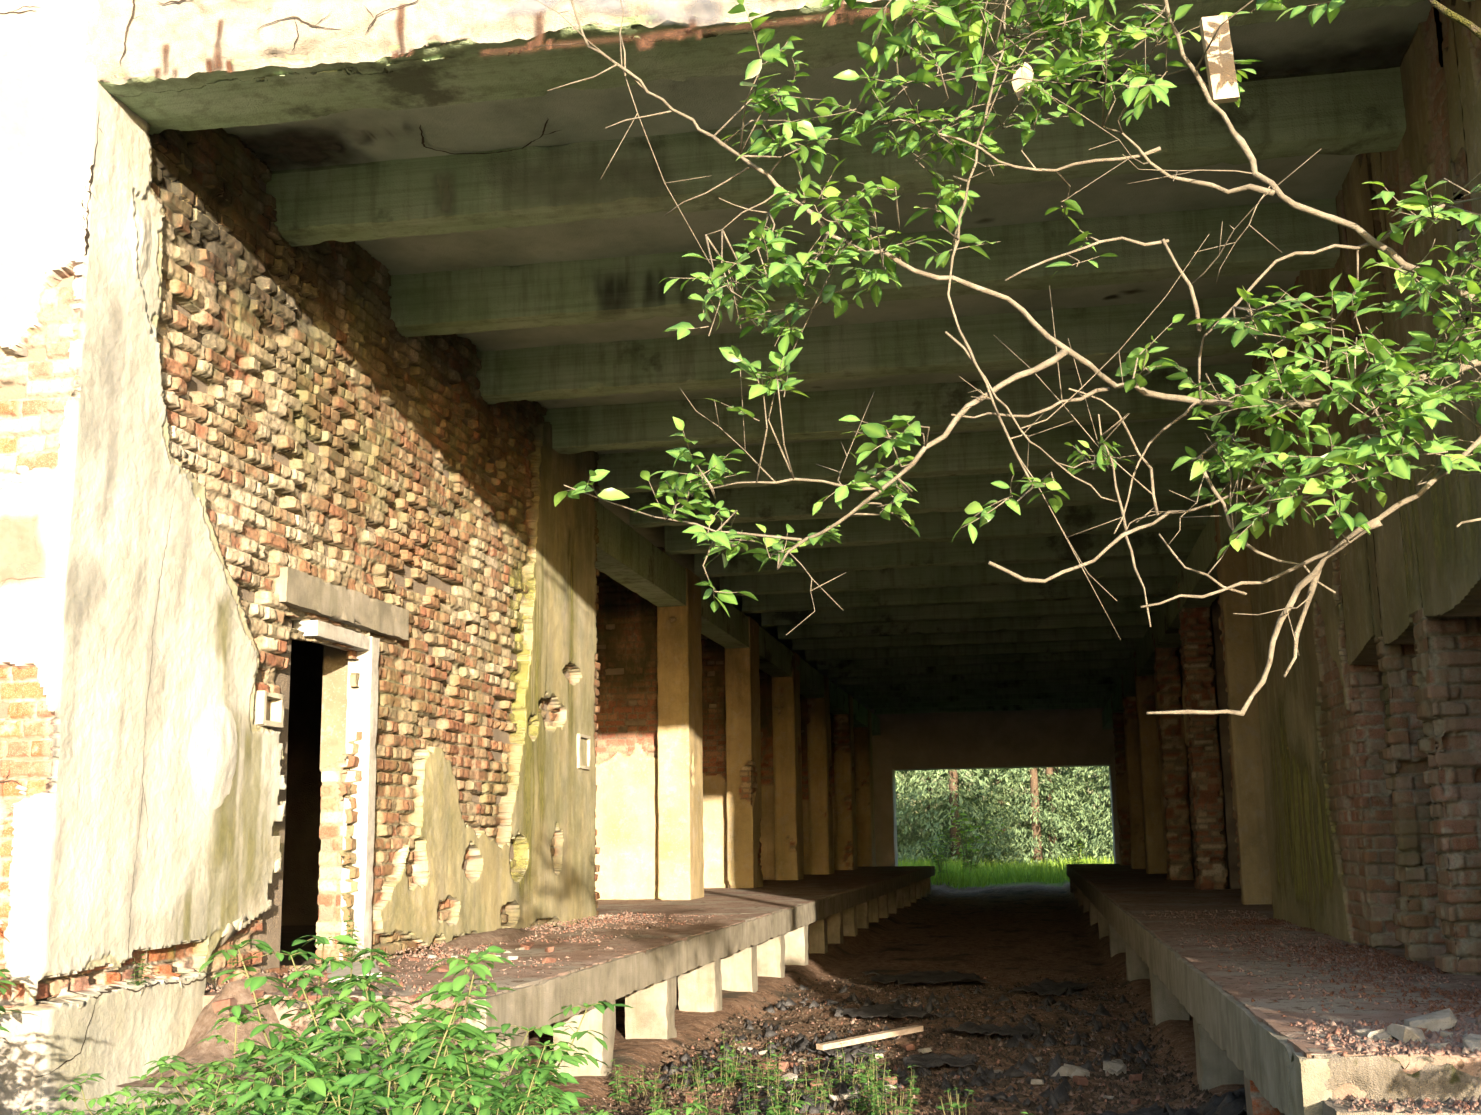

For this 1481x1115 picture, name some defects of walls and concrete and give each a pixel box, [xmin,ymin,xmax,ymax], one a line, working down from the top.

crack [419,119,559,154]
flaking render [0,260,83,490]
water stain [0,517,42,583]
flaking render [148,128,567,961]
flaking render [563,451,601,756]
crack [35,488,207,1078]
flaking render [0,661,326,1009]